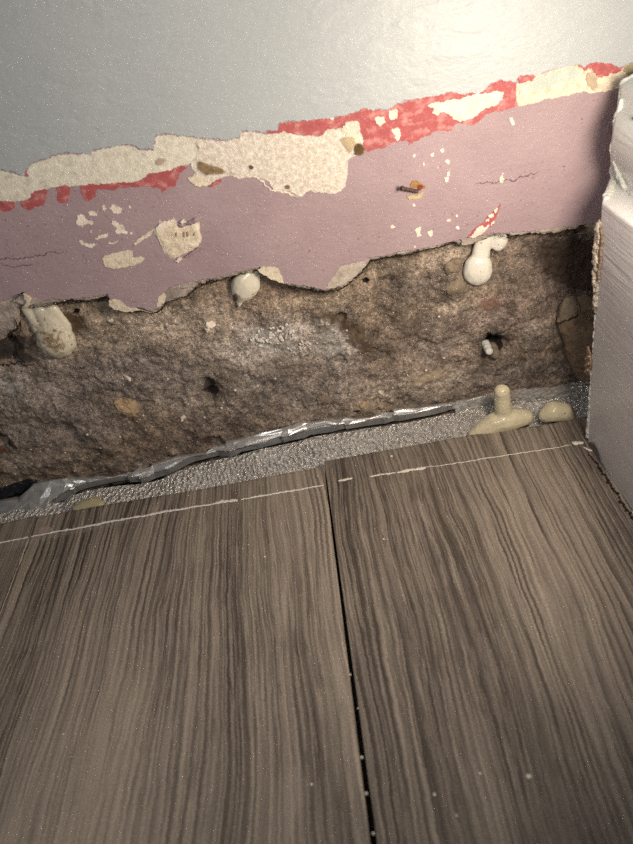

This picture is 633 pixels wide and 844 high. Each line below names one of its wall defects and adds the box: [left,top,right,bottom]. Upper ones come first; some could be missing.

peeling [0,62,633,269]
flaking render [0,204,600,493]